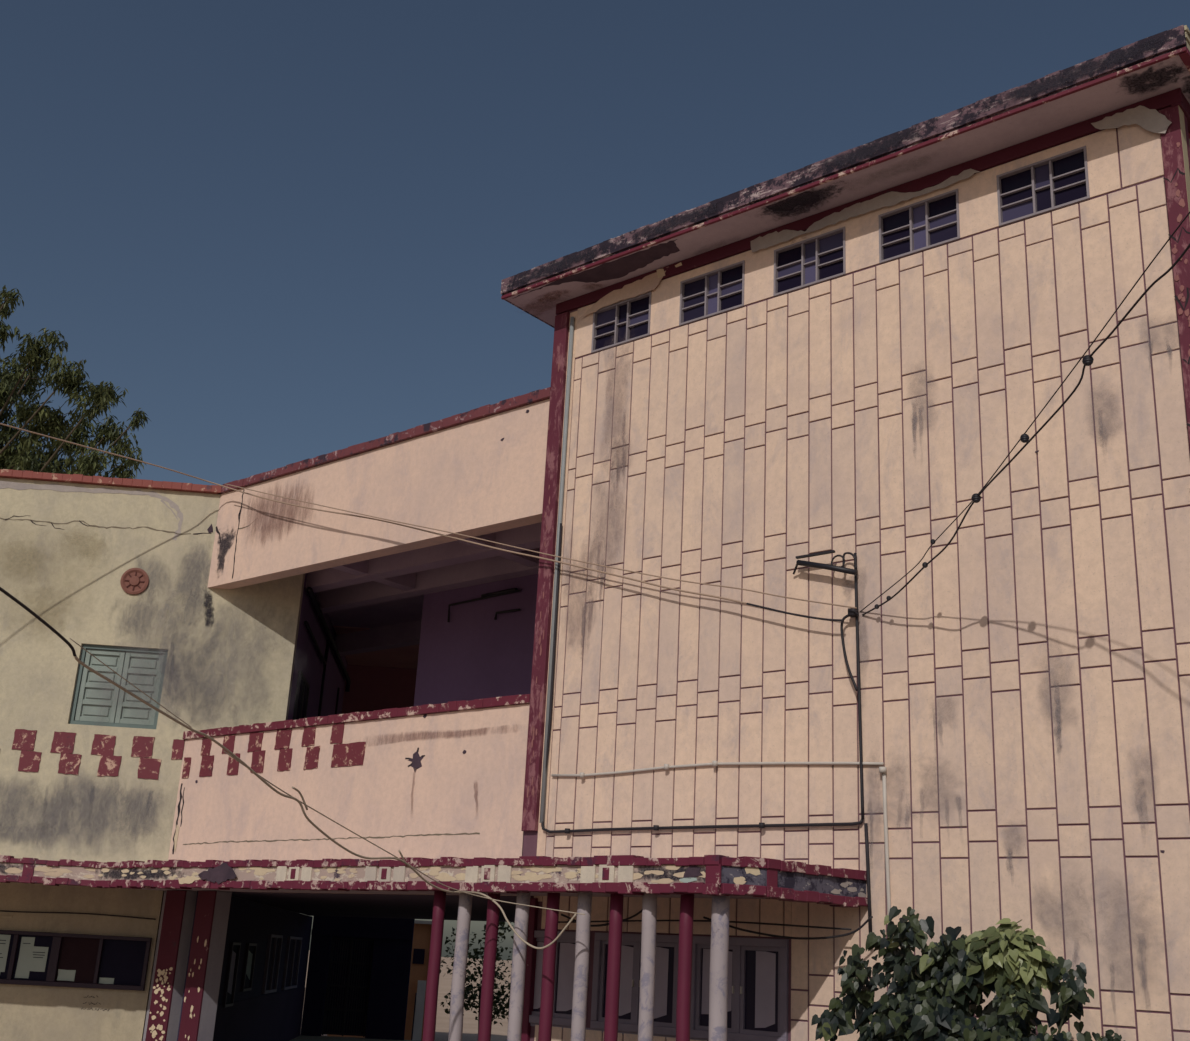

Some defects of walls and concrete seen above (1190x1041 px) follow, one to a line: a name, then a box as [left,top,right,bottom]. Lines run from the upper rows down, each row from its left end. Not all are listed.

damp [986,39,1163,108]
damp [1122,65,1190,94]
damp [801,129,920,175]
peeling [751,169,980,252]
crack [0,490,254,578]
damp [217,531,234,571]
damp [204,594,214,626]
spalling [405,748,425,772]
spalling [5,862,275,884]
peeling [633,865,706,884]
peeling [733,867,760,885]
peeling [149,967,173,1041]